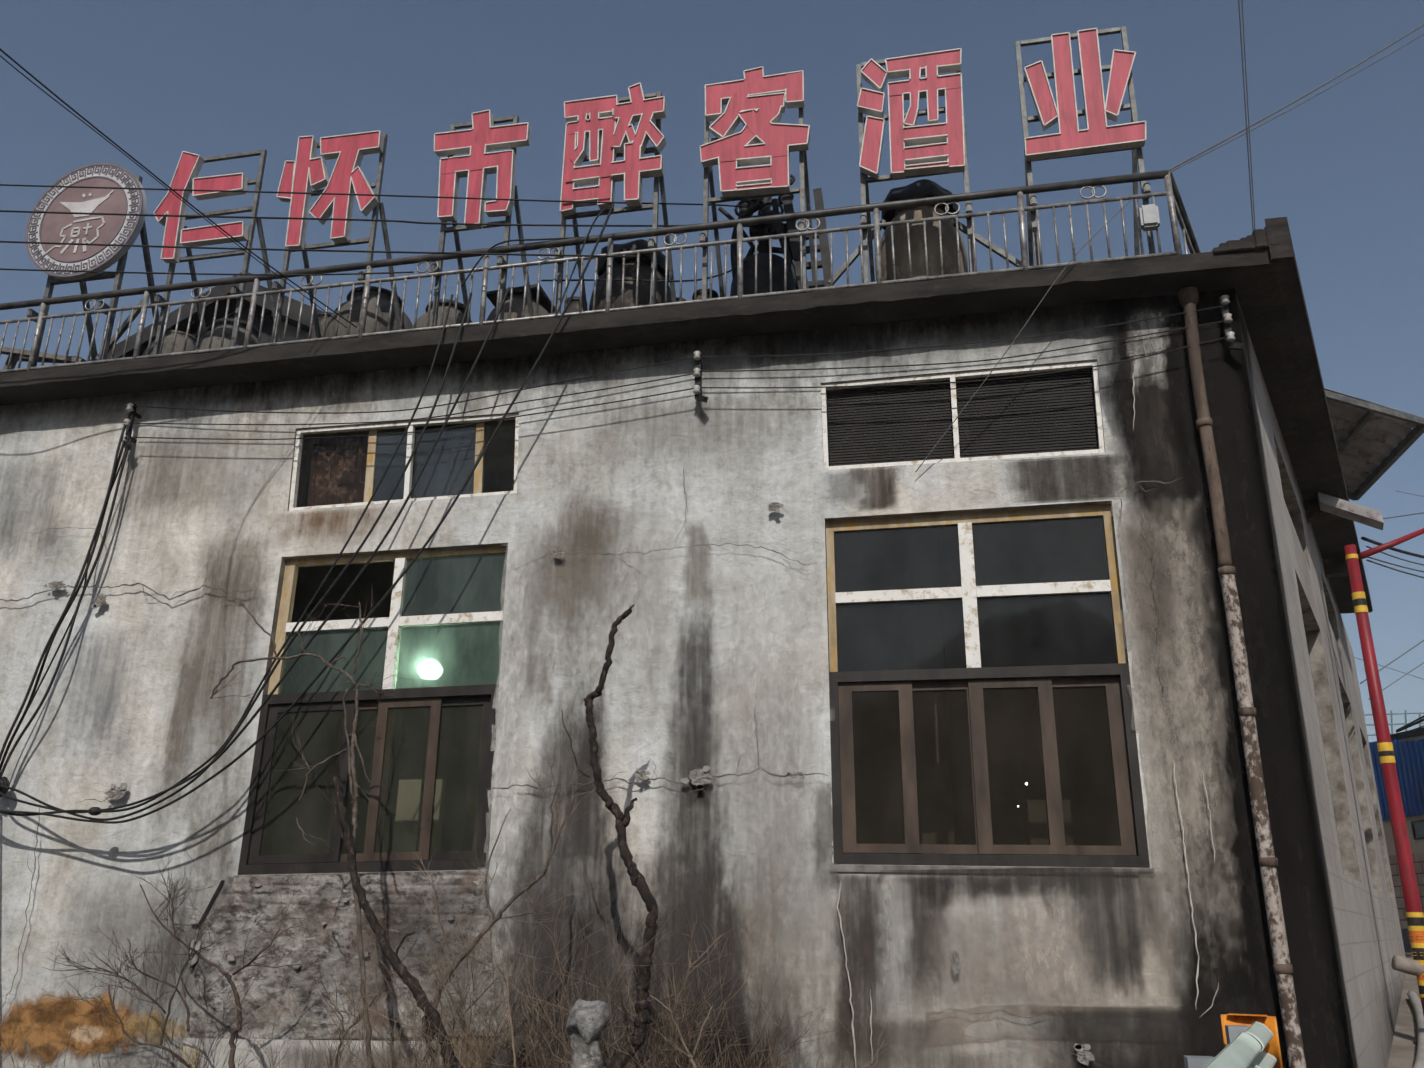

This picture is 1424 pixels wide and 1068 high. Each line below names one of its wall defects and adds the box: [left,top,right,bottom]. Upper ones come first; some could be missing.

crack [0,578,254,602]
damp [173,553,256,756]
damp [491,574,545,787]
crack [485,703,828,795]
damp [848,466,895,508]
damp [1018,454,1117,501]
damp [1129,344,1216,657]
damp [500,628,777,1068]
damp [838,875,931,1067]
damp [905,867,1153,981]